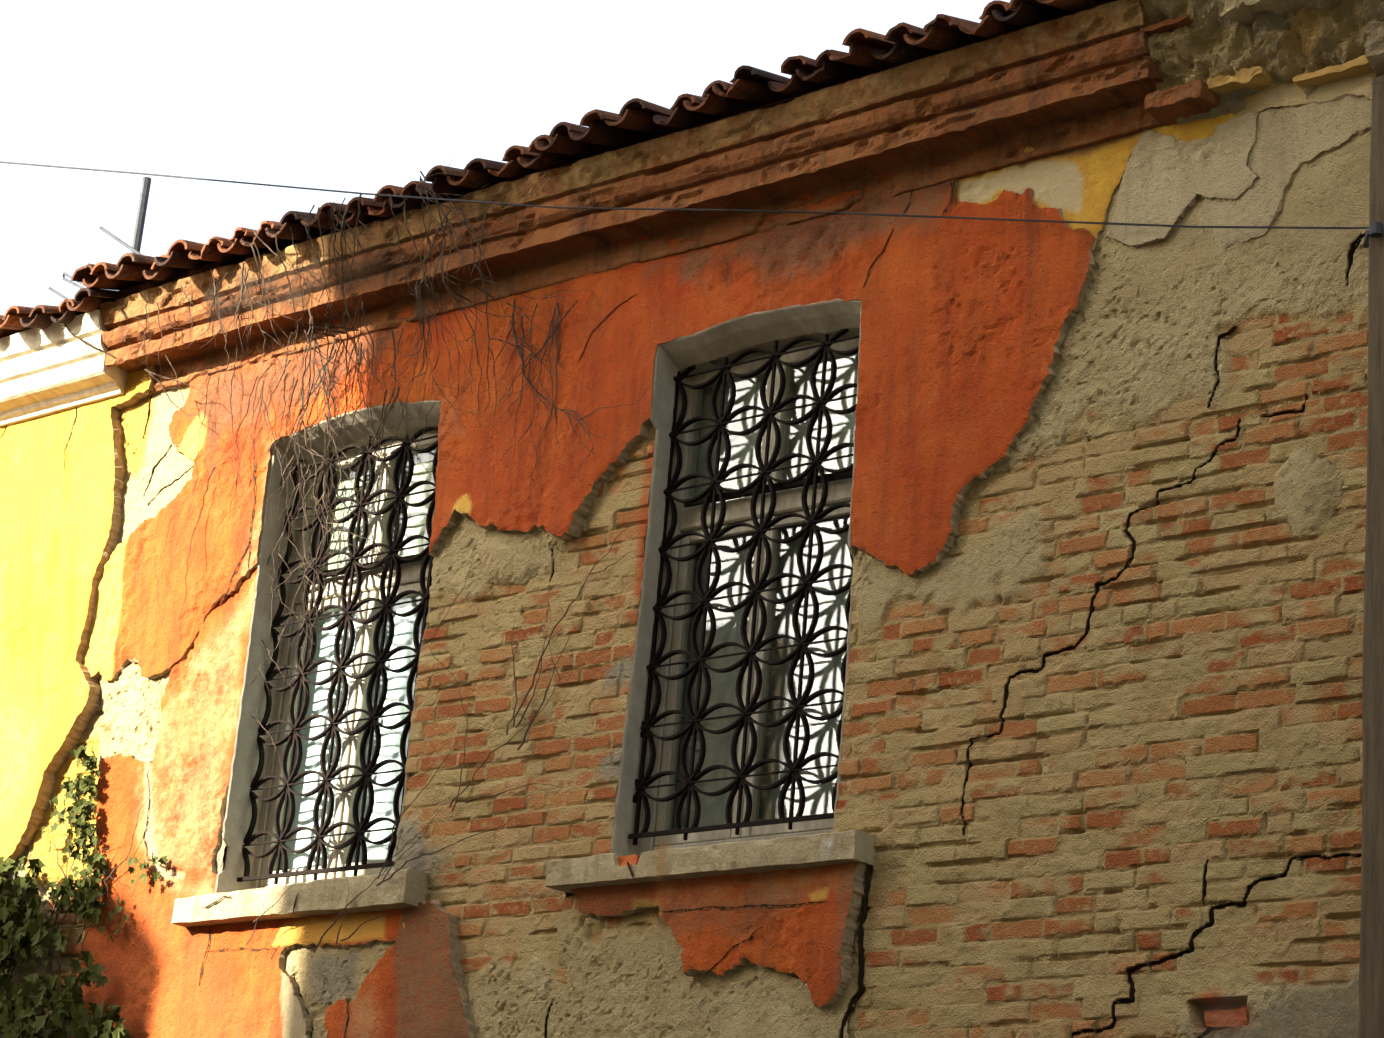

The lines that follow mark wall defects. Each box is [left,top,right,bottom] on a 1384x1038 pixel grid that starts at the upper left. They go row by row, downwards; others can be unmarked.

crack [1346,233,1366,285]
flaking render [117,385,194,545]
flaking render [393,96,1372,1038]
crack [961,326,1308,835]
flaking render [284,940,395,1038]
crack [1072,853,1362,1038]